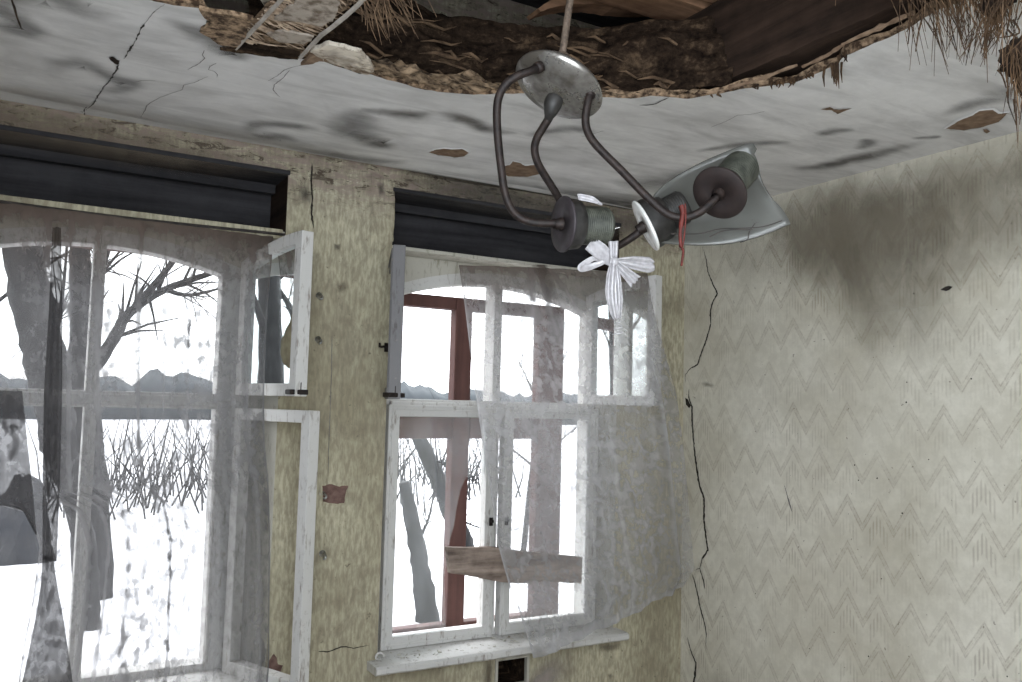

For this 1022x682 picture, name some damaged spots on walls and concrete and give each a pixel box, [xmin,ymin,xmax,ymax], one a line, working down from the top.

crack [80,5,218,118]
flaking render [151,0,524,95]
spalling [601,0,959,99]
peeling [426,147,471,158]
peeling [496,160,539,177]
peeling [943,108,1010,133]
peeling [320,482,350,506]
crack [685,252,718,682]